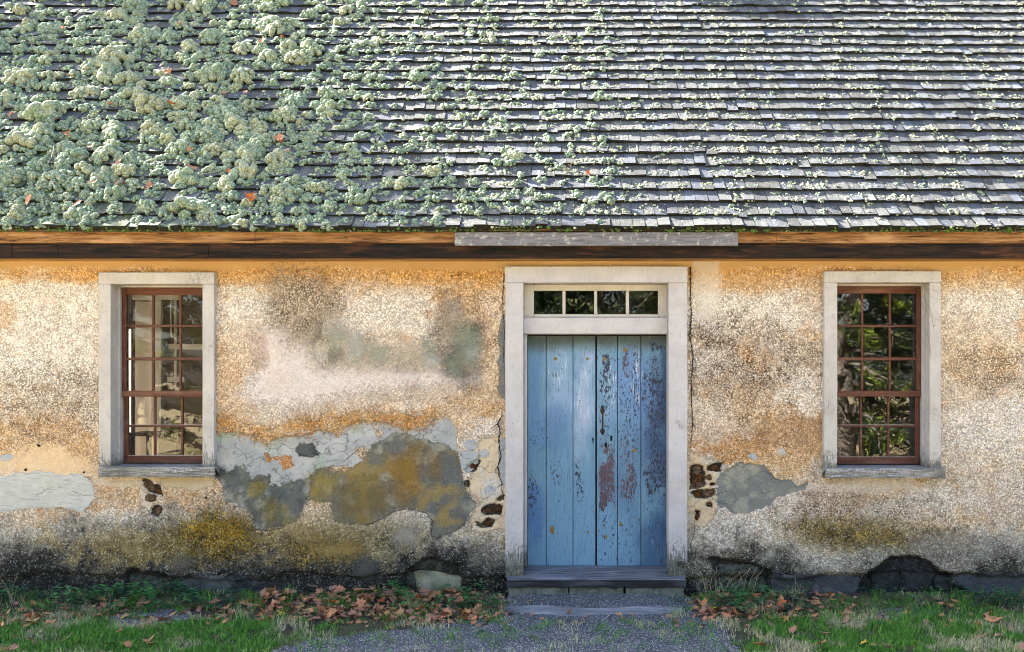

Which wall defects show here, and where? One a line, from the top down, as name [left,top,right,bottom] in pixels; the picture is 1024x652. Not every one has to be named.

damp [258,262,341,352]
crack [689,267,697,448]
spalling [139,417,506,534]
damp [170,432,477,569]
spalling [687,450,727,528]
damp [796,517,913,557]